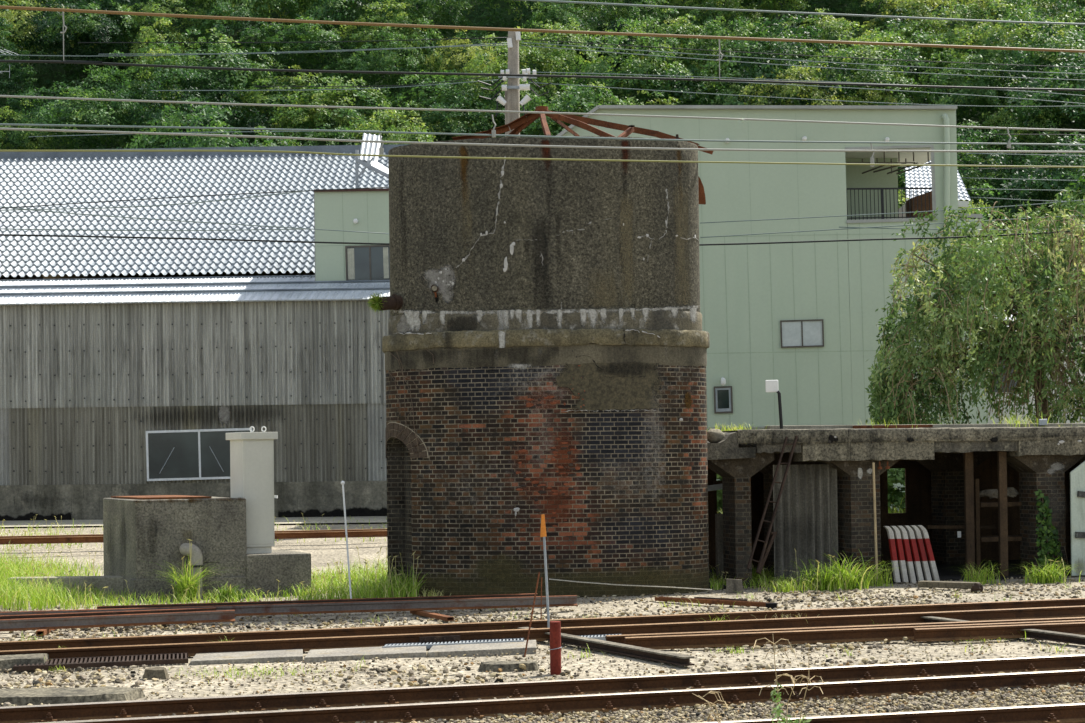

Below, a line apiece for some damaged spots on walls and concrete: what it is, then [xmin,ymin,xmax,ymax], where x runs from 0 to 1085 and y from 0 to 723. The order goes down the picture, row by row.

crack [456,156,506,268]
crack [524,189,699,264]
spalling [425,265,455,302]
spalling [513,438,580,527]